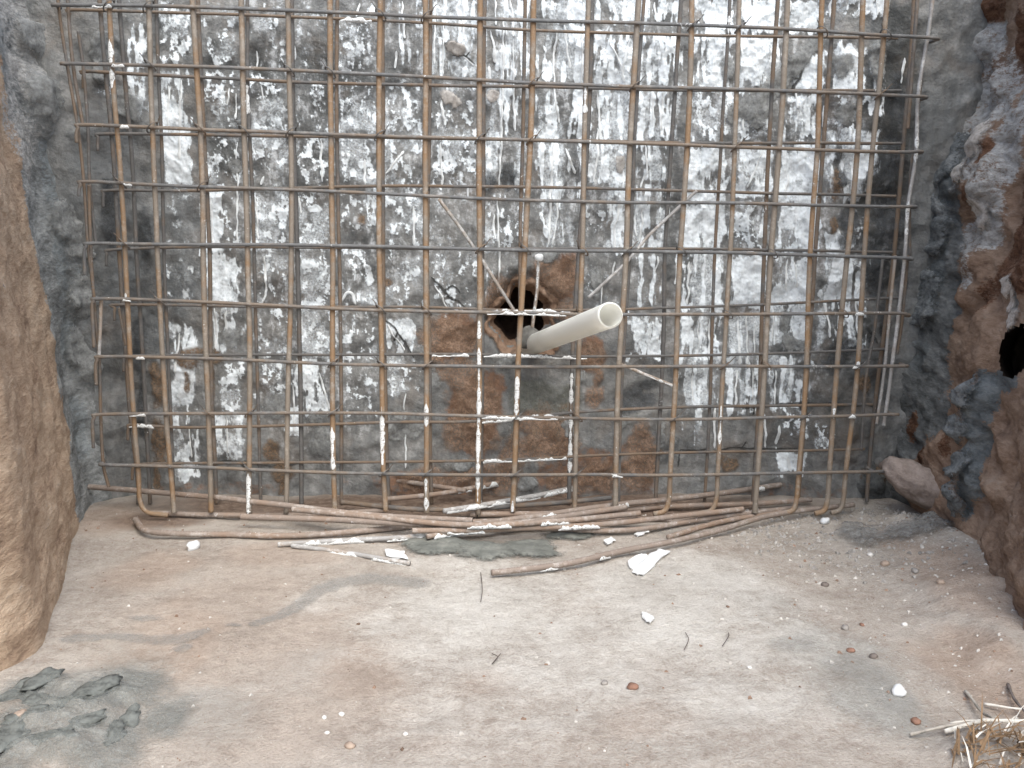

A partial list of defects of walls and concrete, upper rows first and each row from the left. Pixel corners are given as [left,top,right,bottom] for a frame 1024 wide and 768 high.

water stain [127,23,149,114]
water stain [158,0,908,484]
spalling [476,277,518,308]